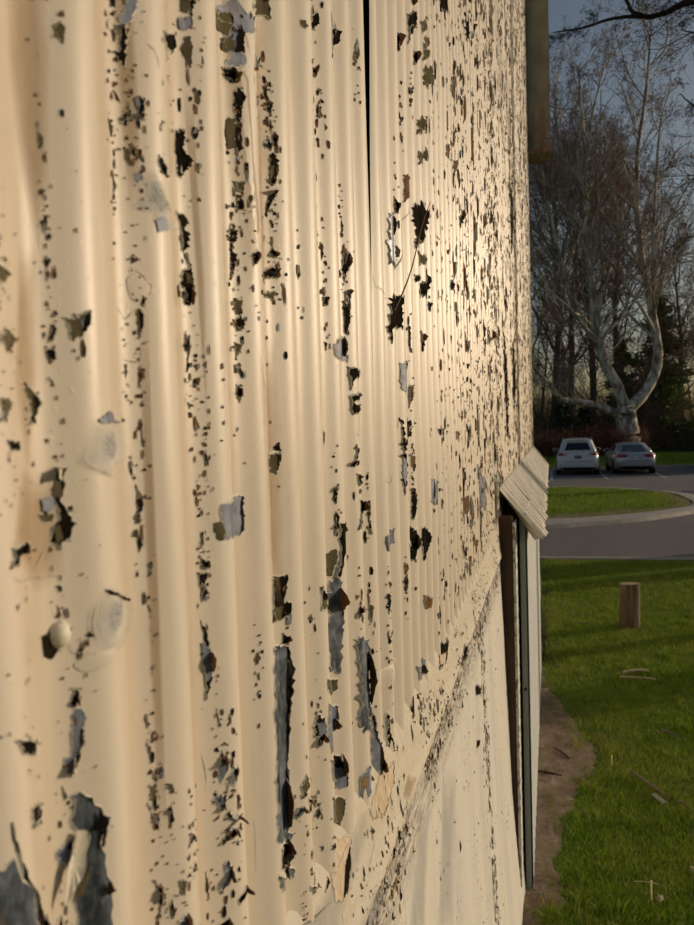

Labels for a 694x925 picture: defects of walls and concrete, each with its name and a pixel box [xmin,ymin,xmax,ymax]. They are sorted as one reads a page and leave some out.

peeling [110,0,138,70]
peeling [163,0,204,68]
peeling [215,0,272,157]
peeling [385,173,433,312]
peeling [23,385,42,426]
peeling [11,540,33,570]
peeling [38,466,78,551]
peeling [215,493,246,541]
peeling [63,688,88,778]
peeling [271,573,322,893]
peeling [308,487,395,904]
peeling [0,786,116,925]